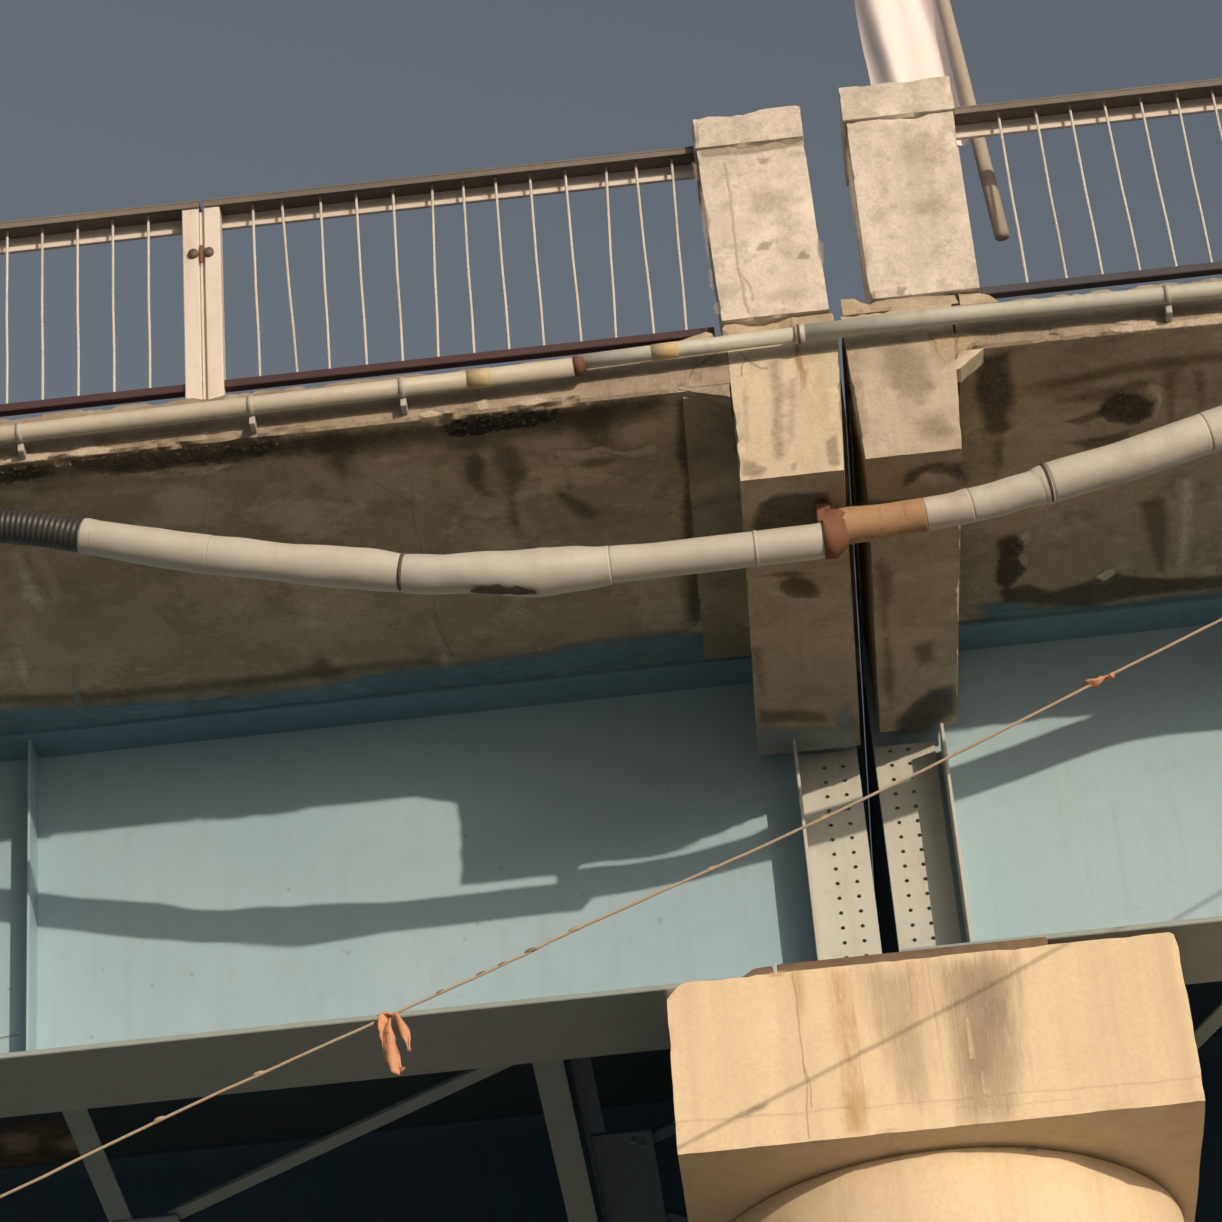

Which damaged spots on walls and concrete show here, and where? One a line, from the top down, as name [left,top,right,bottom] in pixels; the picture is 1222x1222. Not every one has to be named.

damp [978,354,1011,434]
damp [905,464,967,482]
damp [1002,479,1222,617]
damp [899,689,954,734]